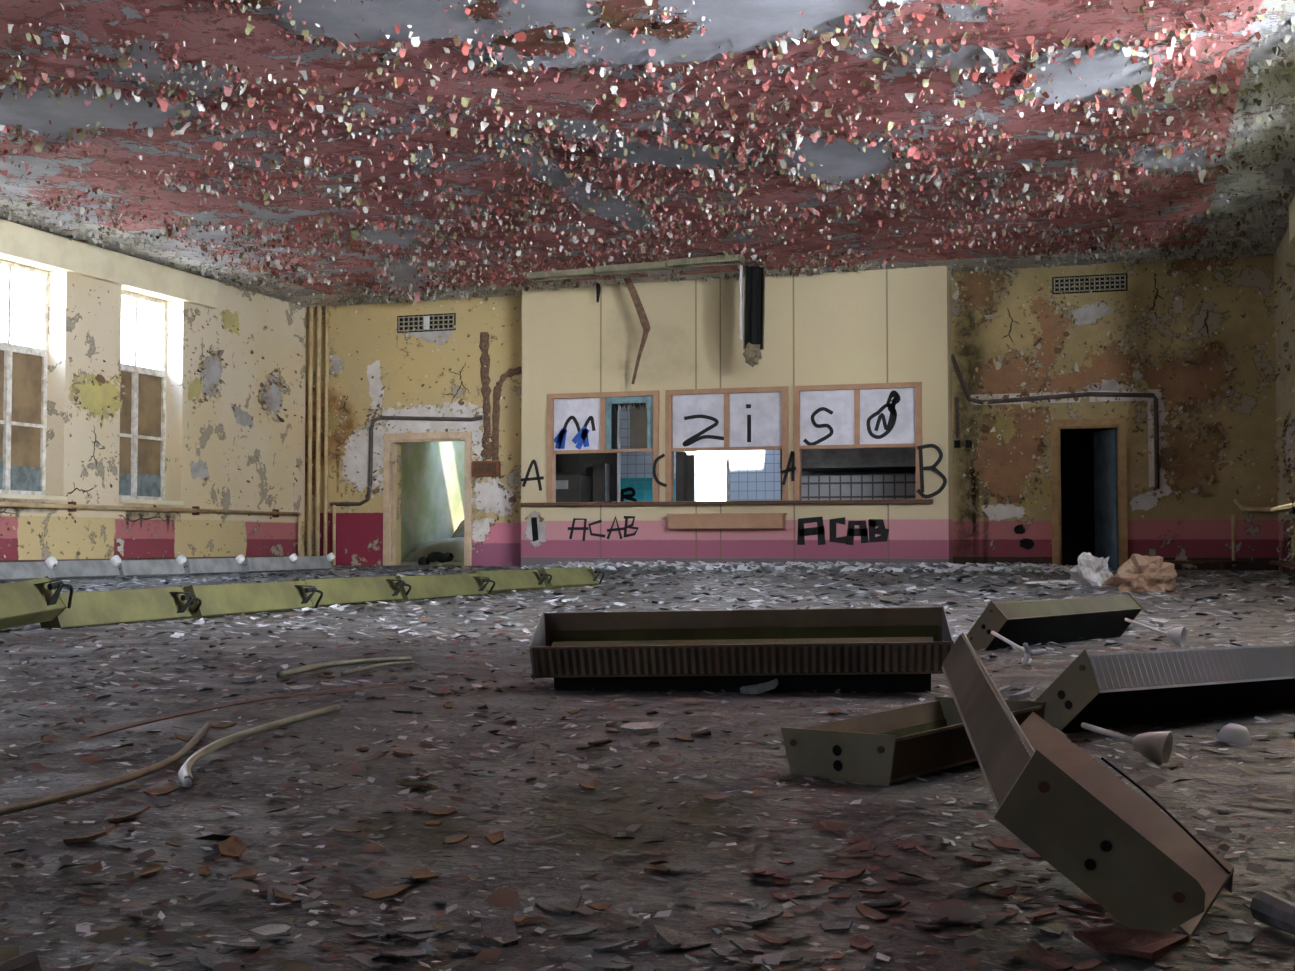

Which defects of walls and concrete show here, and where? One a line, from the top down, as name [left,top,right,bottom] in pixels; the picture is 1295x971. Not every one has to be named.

peeling [0,0,1295,571]